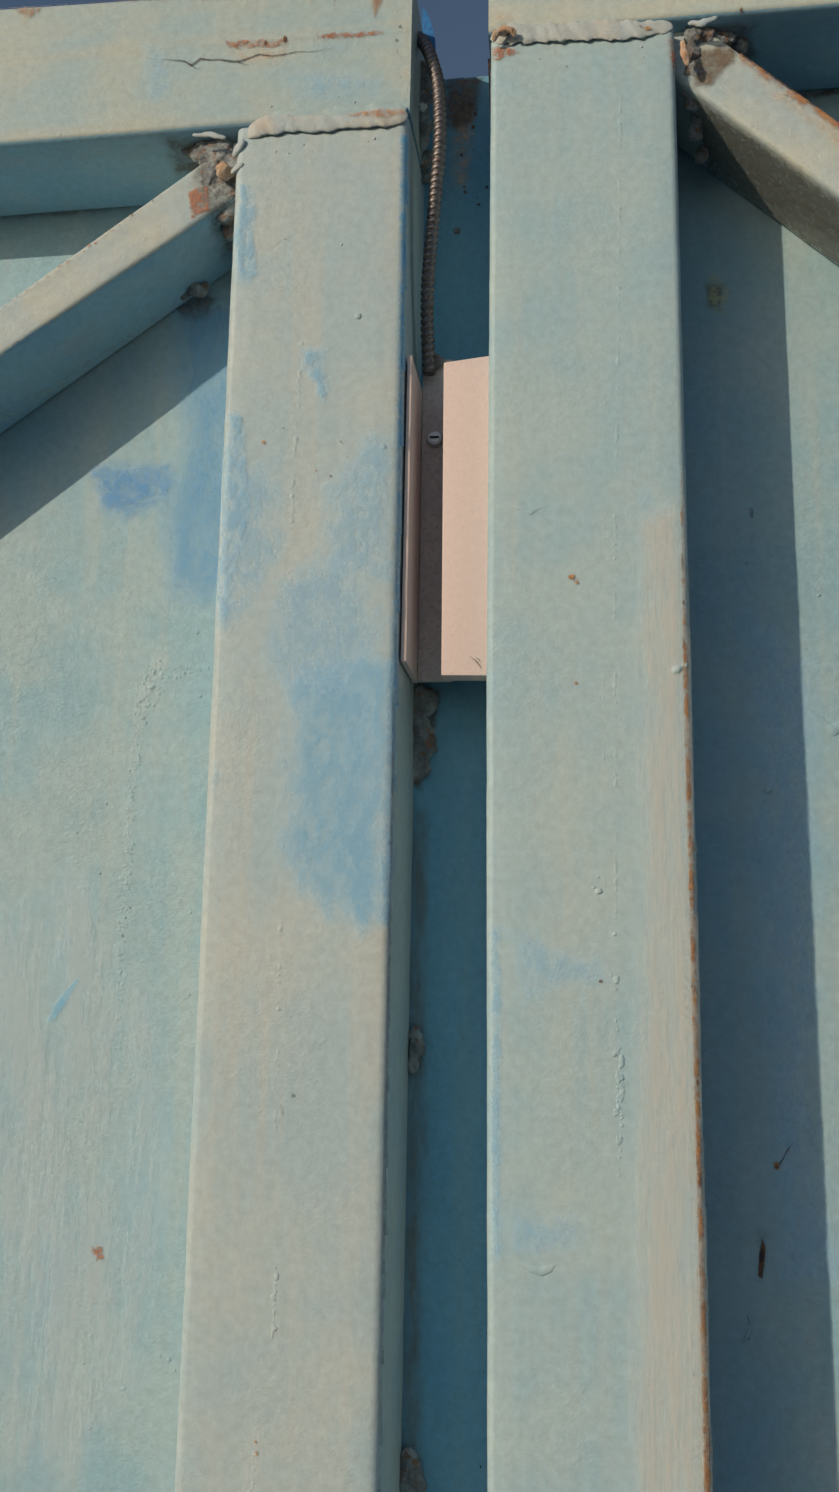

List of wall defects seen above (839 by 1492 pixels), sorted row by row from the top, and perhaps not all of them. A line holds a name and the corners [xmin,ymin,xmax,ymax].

crack [167,50,312,66]
rust [226,36,287,57]
peeling [680,16,718,66]
peeling [192,131,245,174]
rust [686,744,694,909]
rust [690,933,702,1186]
rust [700,1259,713,1492]